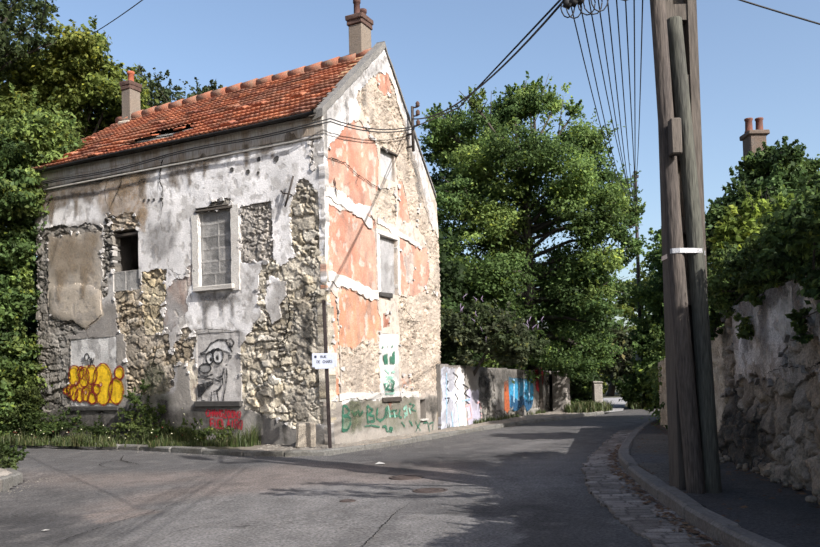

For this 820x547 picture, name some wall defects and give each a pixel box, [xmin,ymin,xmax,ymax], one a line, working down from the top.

flaking render [35,212,198,414]
damp [39,151,231,223]
damp [260,132,296,157]
flaking render [208,72,441,429]